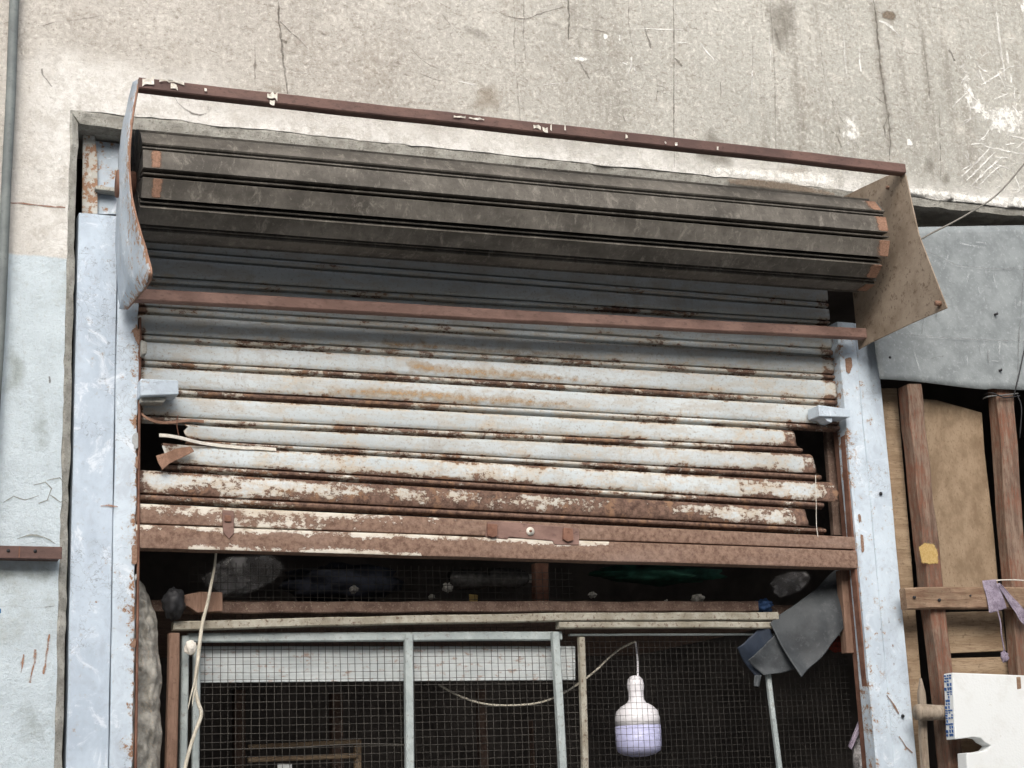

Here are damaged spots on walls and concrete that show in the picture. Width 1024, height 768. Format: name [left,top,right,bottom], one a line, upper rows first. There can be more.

crack [278,4,297,94]
crack [874,8,891,155]
spalling [962,74,1023,133]
rust [337,388,532,404]
crack [4,477,69,504]
rust [21,634,50,683]